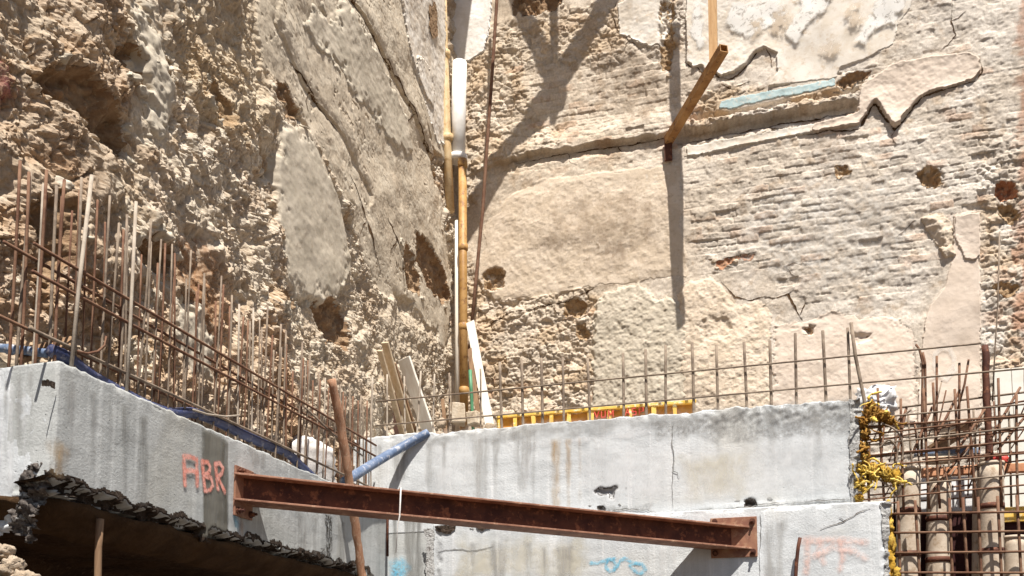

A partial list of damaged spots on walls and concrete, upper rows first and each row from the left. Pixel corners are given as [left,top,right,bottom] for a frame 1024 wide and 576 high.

crack [290,63,336,129]
crack [516,61,983,165]
flaking render [617,0,980,133]
crack [706,251,833,319]
spalling [0,160,1024,576]
crack [616,423,680,513]
crack [707,499,869,576]